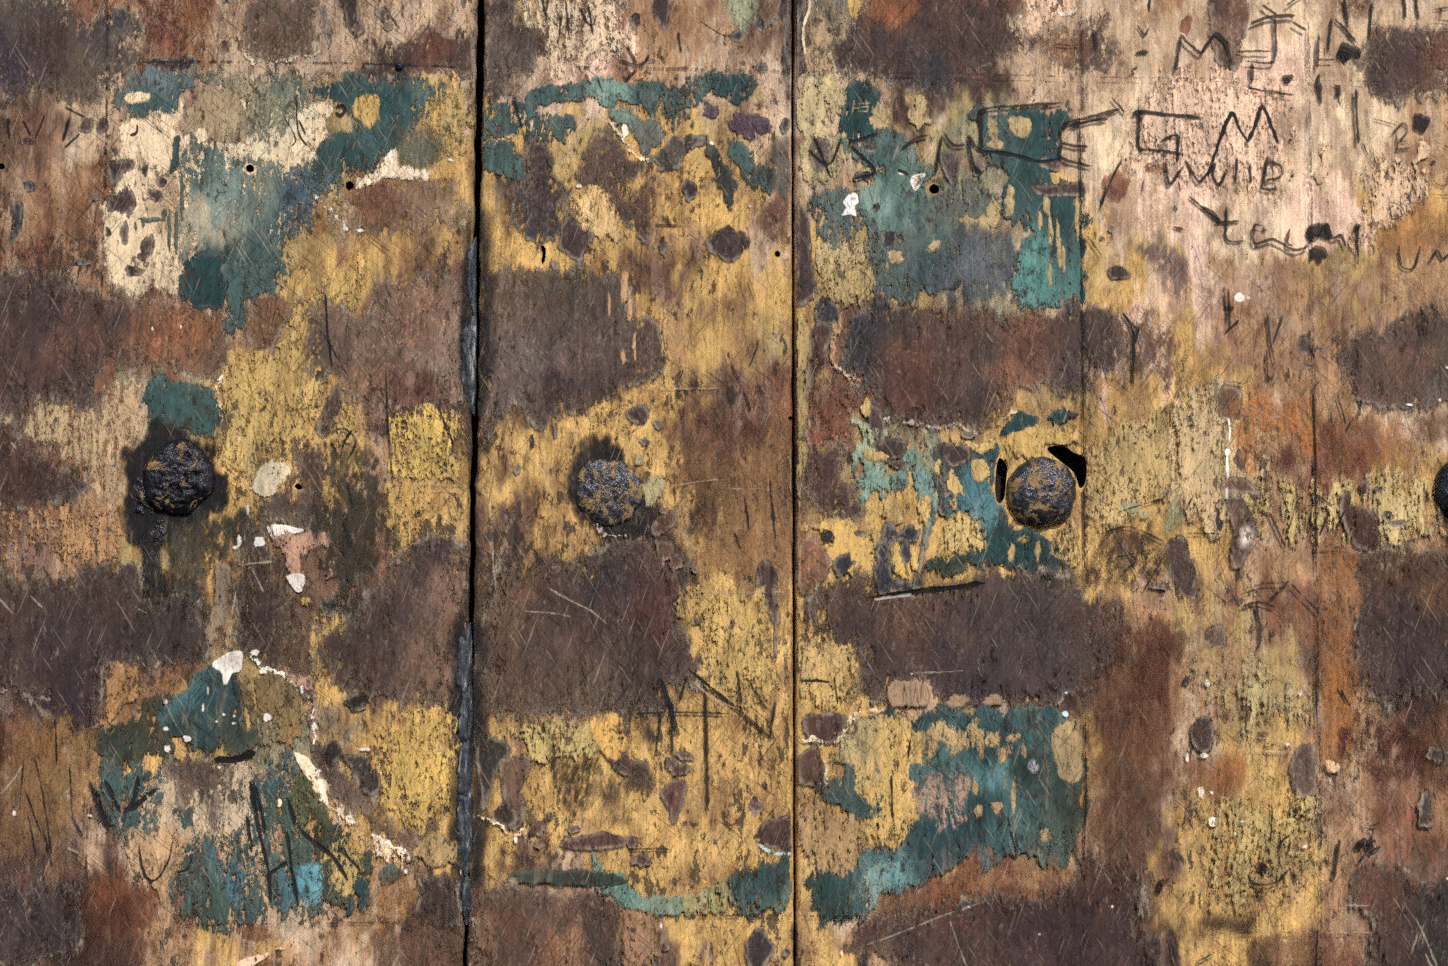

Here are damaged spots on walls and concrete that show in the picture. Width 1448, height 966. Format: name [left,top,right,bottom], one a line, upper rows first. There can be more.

peeling [0,0,197,135]
peeling [218,0,576,138]
peeling [826,0,1123,153]
peeling [939,115,1005,187]
peeling [704,224,750,263]
rust [118,418,229,615]
peeling [0,103,720,867]
rust [568,434,655,544]
rust [664,412,764,532]
peeling [787,157,1136,819]
peeling [755,559,781,660]
peeling [748,795,792,856]